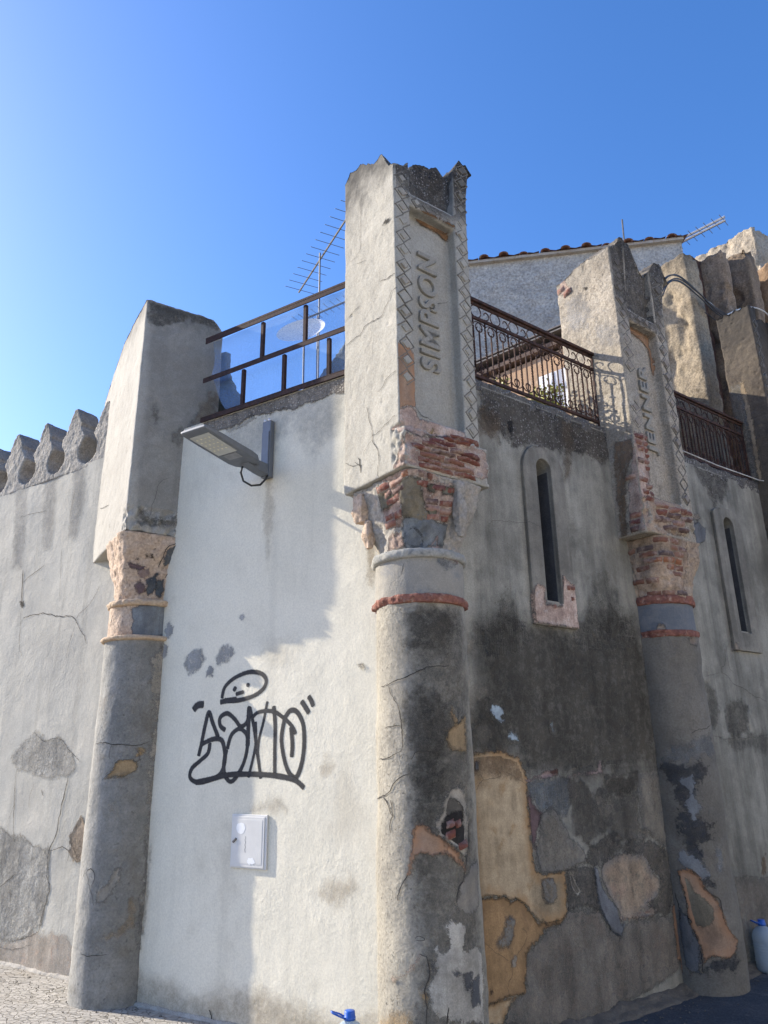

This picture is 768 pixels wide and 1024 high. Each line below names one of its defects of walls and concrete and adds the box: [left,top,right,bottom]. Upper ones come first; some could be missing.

spalling [0,733,85,942]
crack [19,553,97,656]
flaking render [102,524,177,860]
crack [377,665,449,833]
spalling [376,343,489,567]
water stain [411,599,722,1024]
flaking render [397,708,768,1024]
spalling [613,431,706,597]